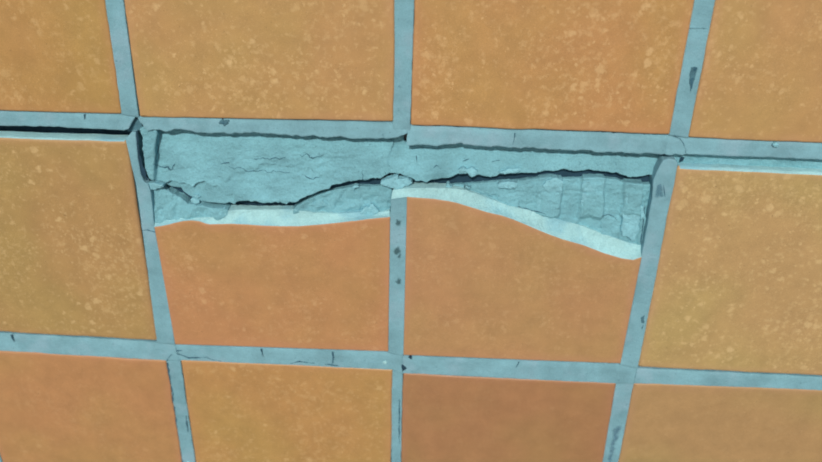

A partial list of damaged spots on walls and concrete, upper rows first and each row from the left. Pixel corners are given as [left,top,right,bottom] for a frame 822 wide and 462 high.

crack [128,119,148,180]
crack [167,184,192,199]
crack [230,169,665,206]
spalling [127,118,658,372]